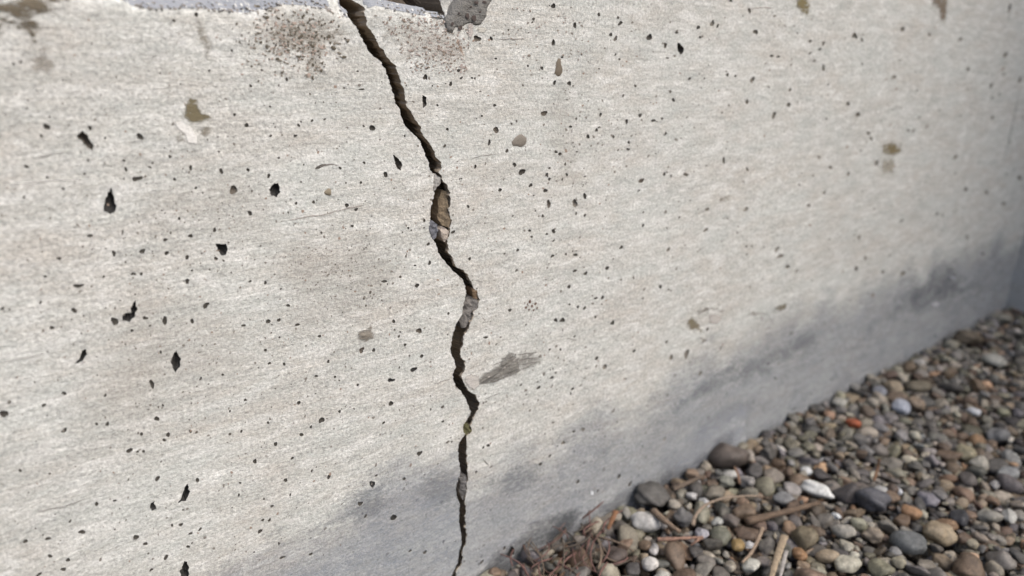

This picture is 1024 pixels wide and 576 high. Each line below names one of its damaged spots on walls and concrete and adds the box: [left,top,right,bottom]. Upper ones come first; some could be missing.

crack [339,0,497,576]